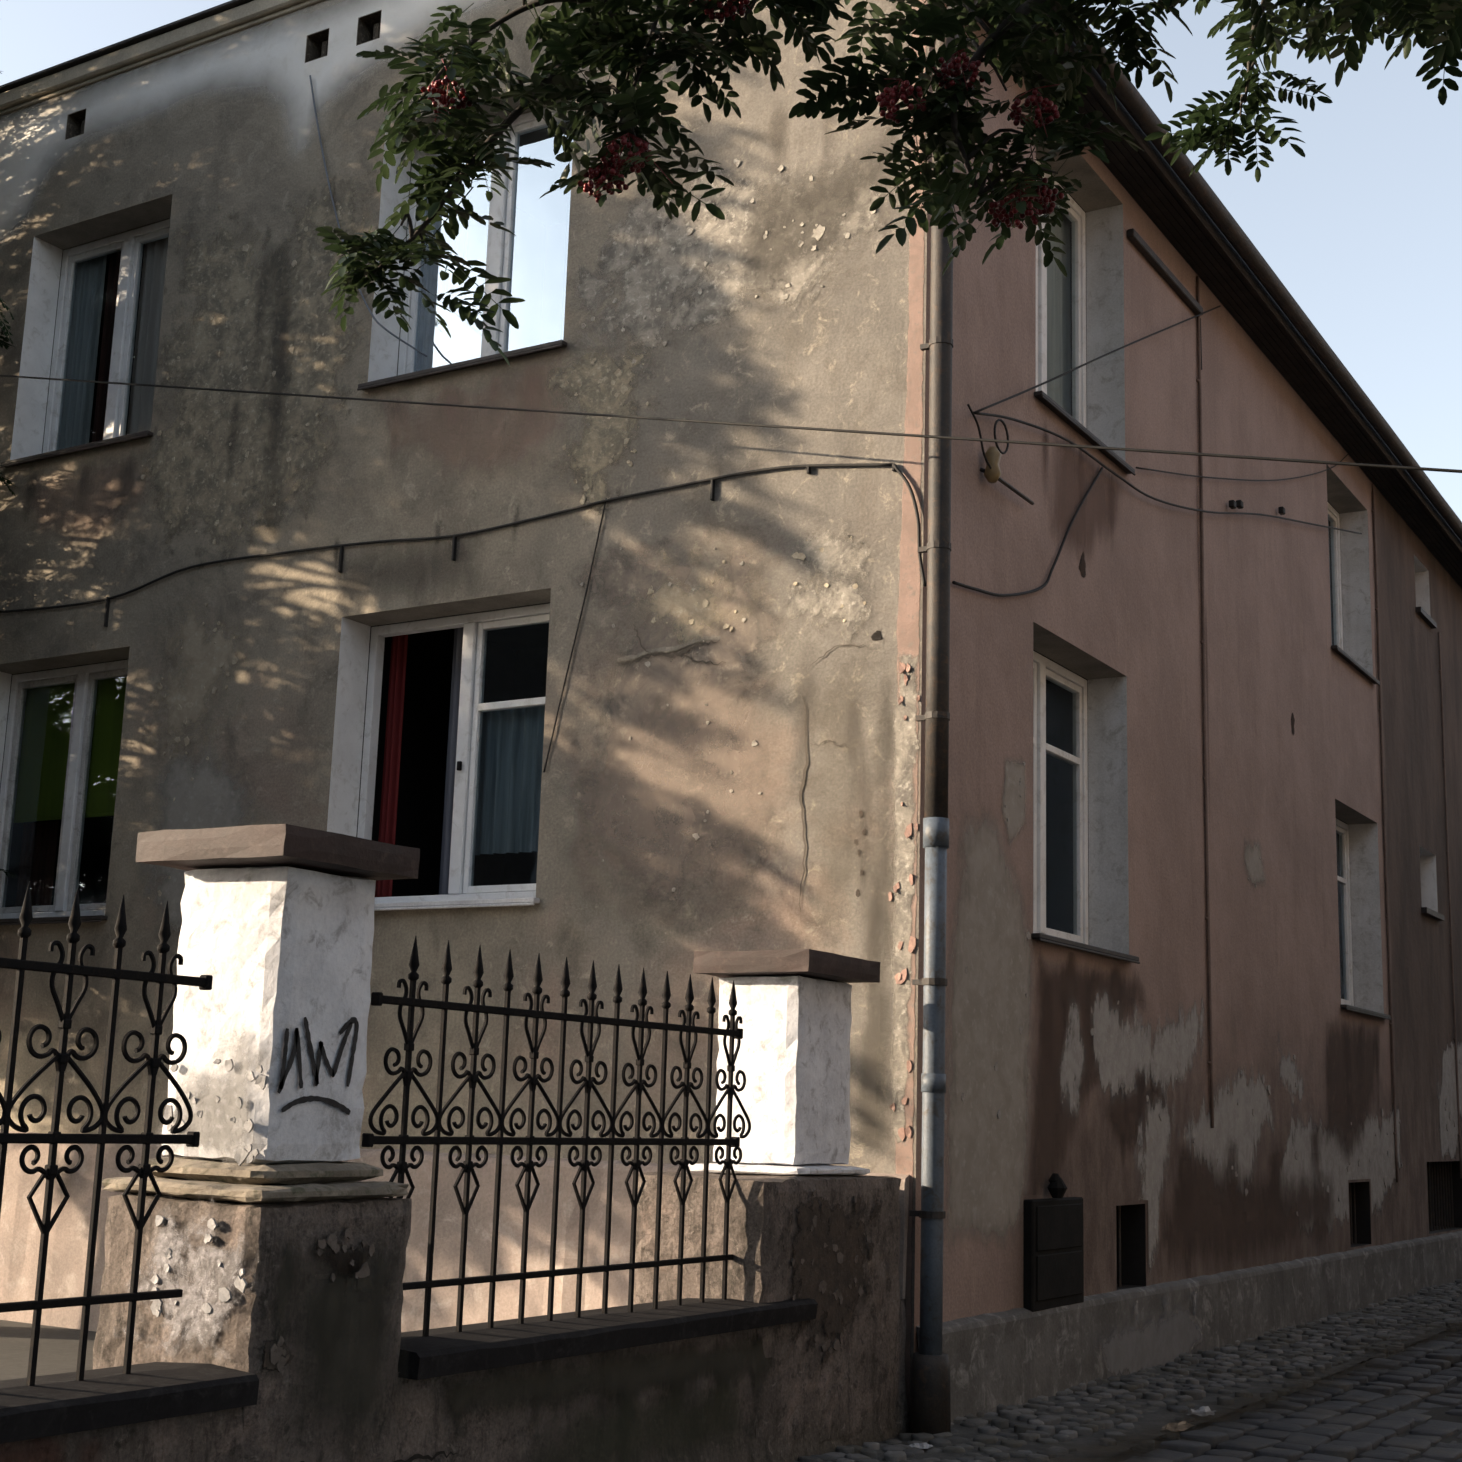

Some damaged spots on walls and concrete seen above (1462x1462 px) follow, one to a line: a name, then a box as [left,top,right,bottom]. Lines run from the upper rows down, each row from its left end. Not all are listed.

crack [617,624,726,665]
crack [799,644,876,911]
peeling [888,655,920,1143]
peeling [1059,993,1402,1267]
peeling [1438,1042,1462,1159]
spalling [129,1215,247,1355]